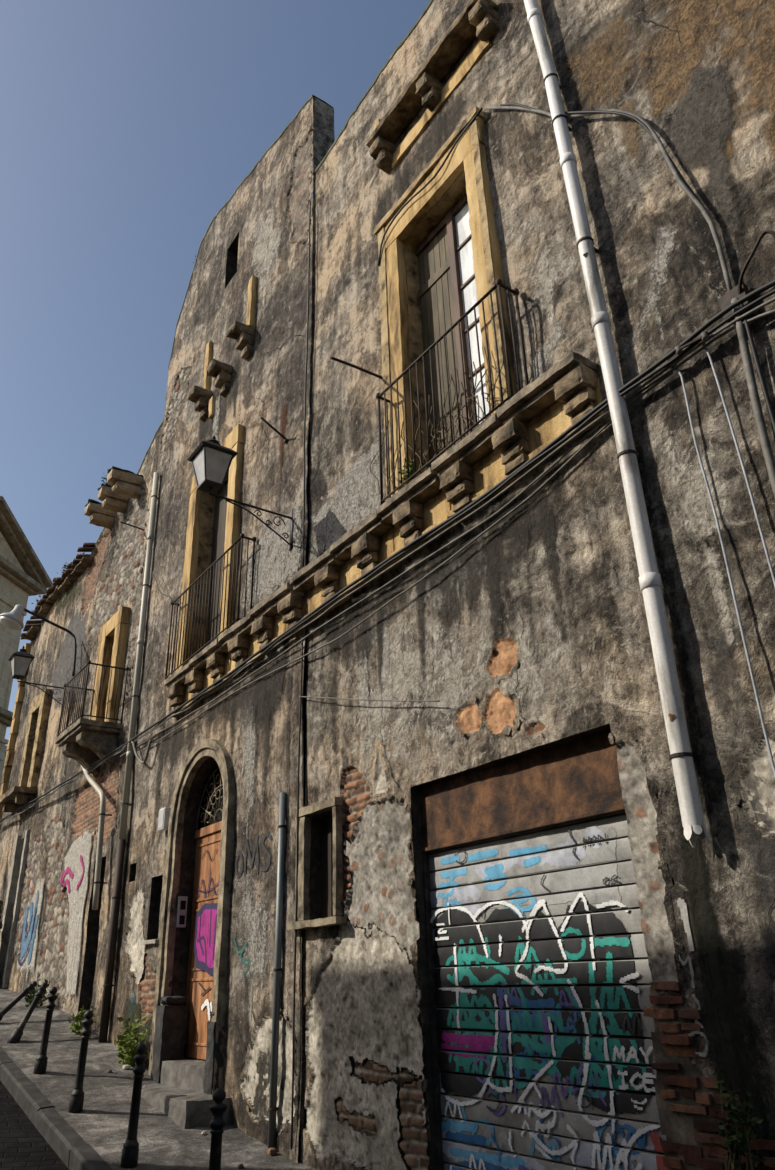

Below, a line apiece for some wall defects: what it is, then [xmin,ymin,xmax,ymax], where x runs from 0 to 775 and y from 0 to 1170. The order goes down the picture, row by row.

leakage [326,463,567,773]
flaking render [452,631,553,748]
flaking render [13,758,121,1006]
flaking render [235,738,429,1170]
flaking render [608,733,775,1170]